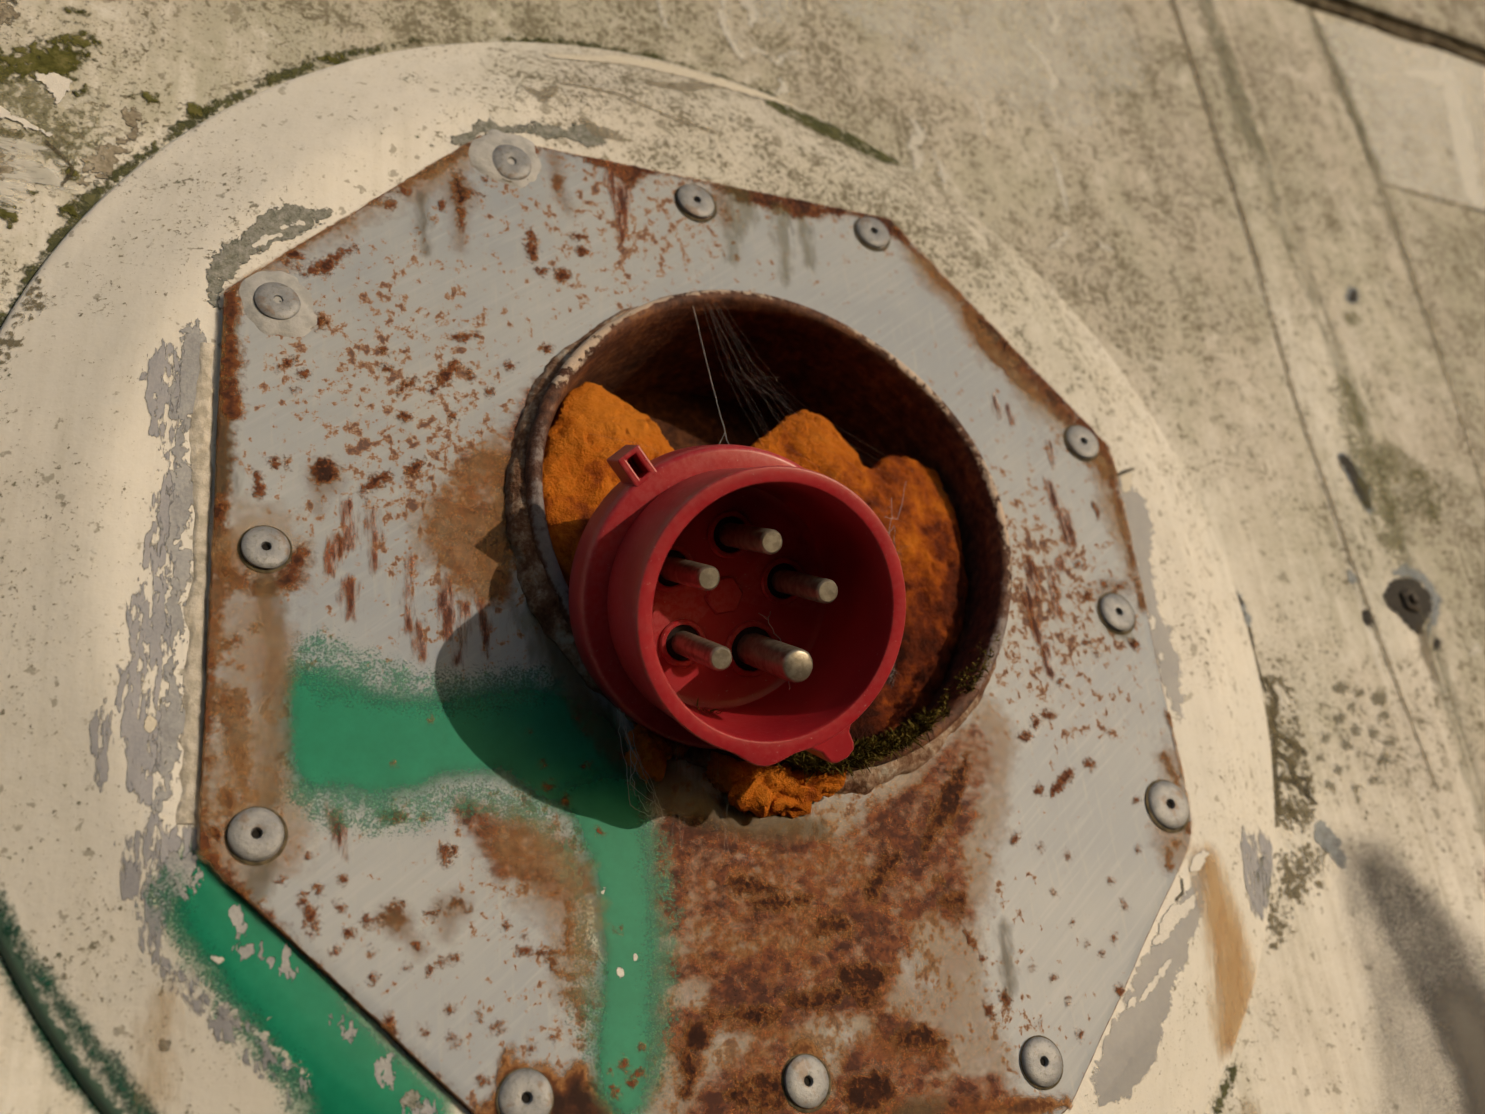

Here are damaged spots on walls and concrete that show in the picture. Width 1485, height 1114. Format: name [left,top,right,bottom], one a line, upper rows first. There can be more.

peeling [0,6,102,104]
peeling [0,91,160,229]
peeling [206,203,334,310]
rust [566,152,1147,609]
rust [200,135,495,935]
rust [1018,481,1082,684]
peeling [90,318,312,1108]
rust [330,898,459,975]
rust [454,724,1073,1114]
rust [1034,758,1096,797]
peeling [1090,849,1209,1107]
peeling [1238,826,1273,921]